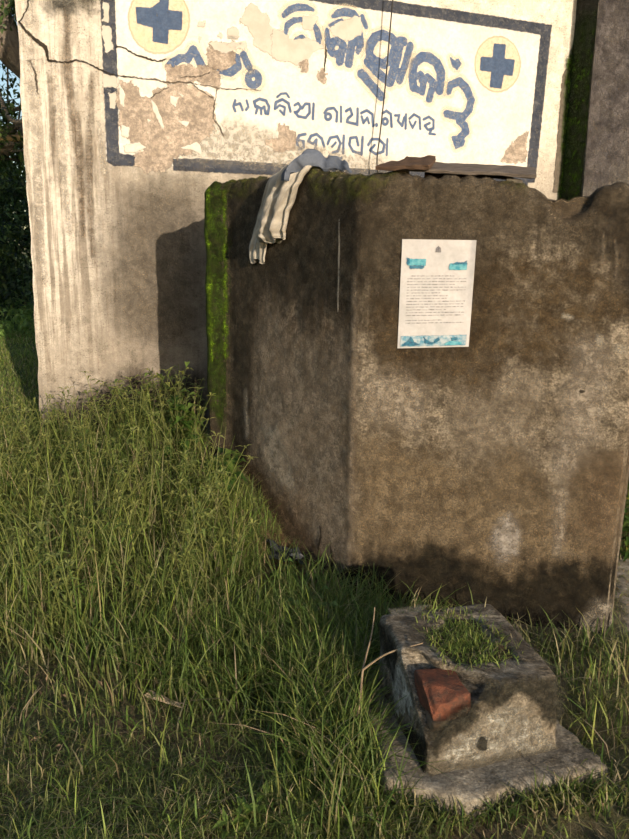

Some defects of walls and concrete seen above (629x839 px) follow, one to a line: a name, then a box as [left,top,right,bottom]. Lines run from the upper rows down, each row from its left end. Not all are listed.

crack [18,0,261,136]
damp [114,186,195,334]
peeling [101,2,328,174]
damp [223,178,246,233]
peeling [330,16,363,41]
peeling [501,131,529,164]
damp [49,244,228,435]
damp [264,427,294,487]
damp [554,338,612,474]
damp [243,461,618,776]